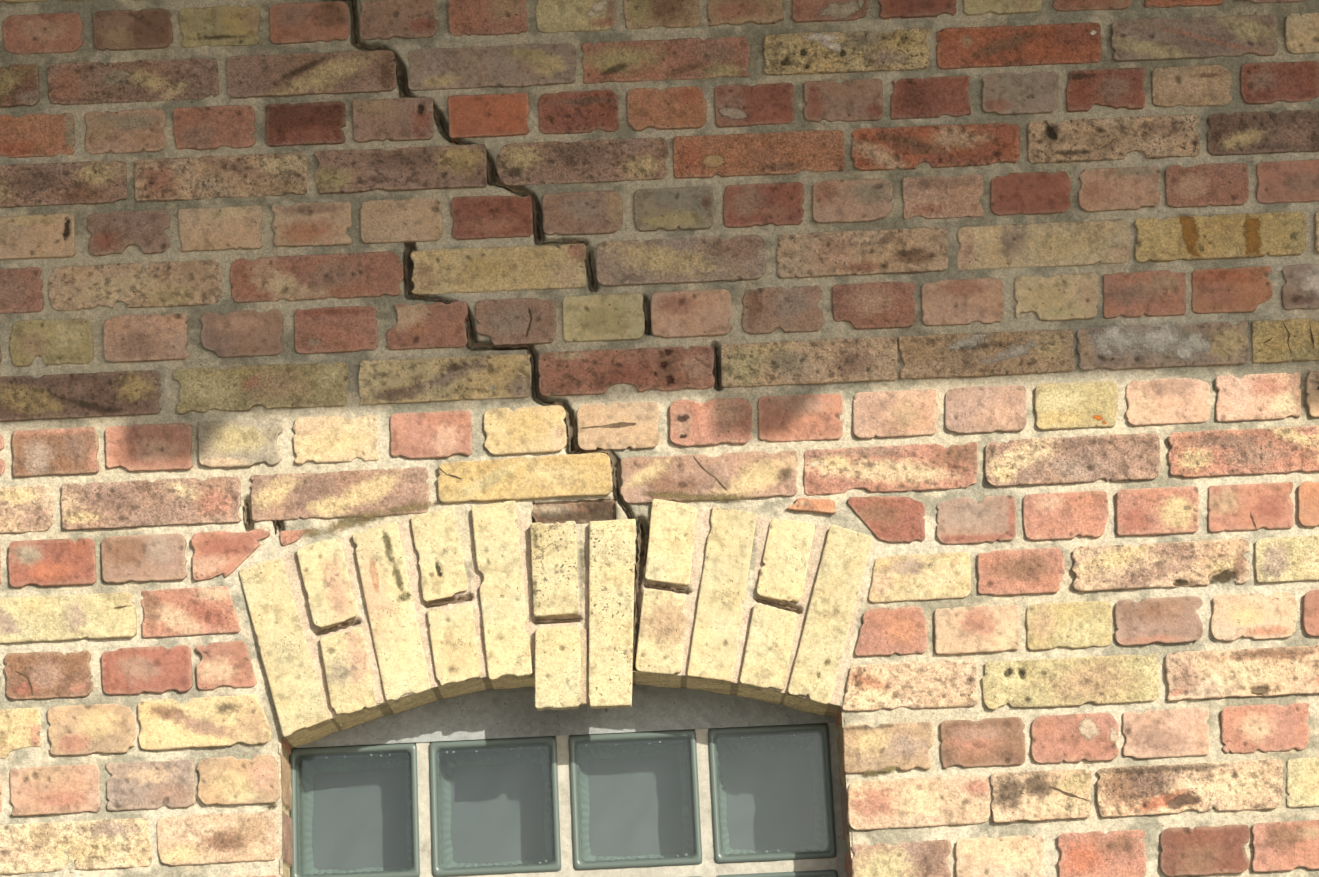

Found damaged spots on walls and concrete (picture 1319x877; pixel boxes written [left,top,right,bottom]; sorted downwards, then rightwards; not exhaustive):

crack [332,0,595,289]
crack [404,246,648,666]
crack [643,299,651,331]
crack [712,346,720,387]